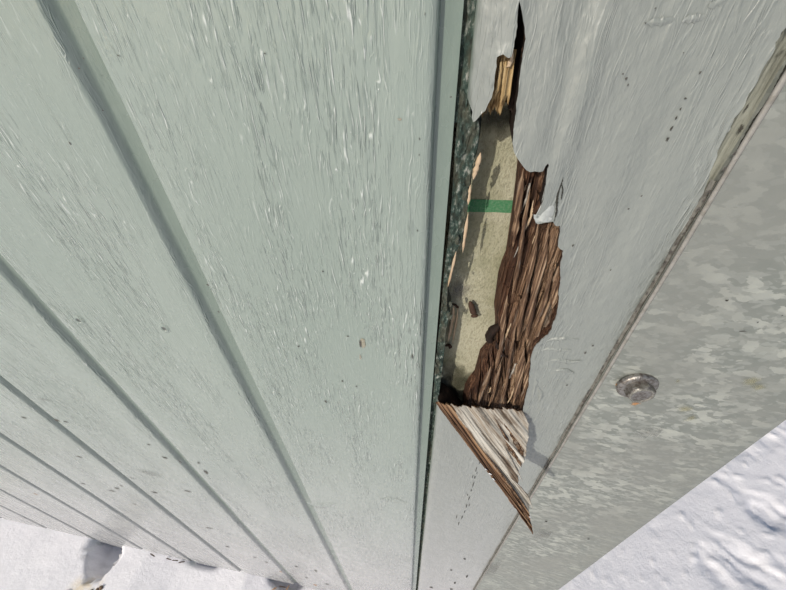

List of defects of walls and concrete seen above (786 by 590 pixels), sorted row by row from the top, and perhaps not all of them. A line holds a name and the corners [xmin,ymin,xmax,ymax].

peeling [433,89,482,403]
peeling [533,193,554,222]